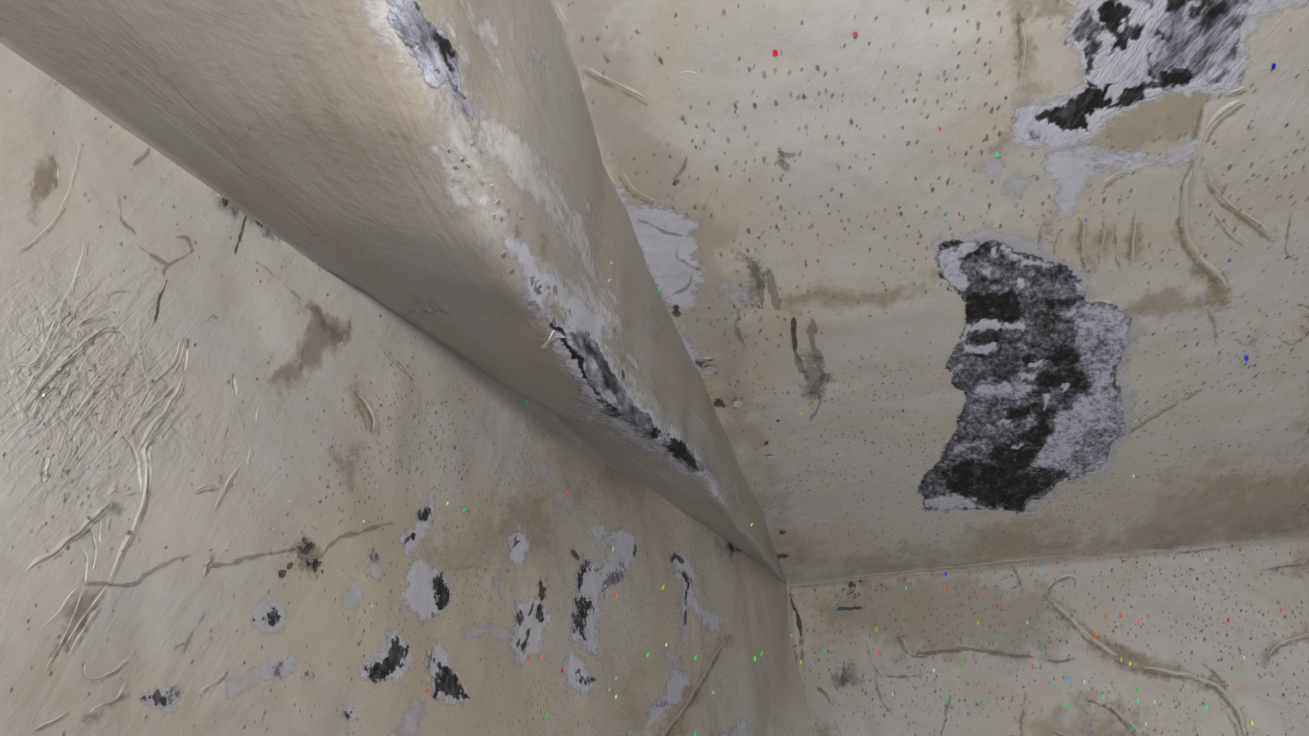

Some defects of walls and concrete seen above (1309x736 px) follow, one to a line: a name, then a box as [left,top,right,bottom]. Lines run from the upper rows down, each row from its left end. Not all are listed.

spalling [978,0,1309,218]
spalling [361,0,736,506]
spalling [917,227,1141,518]
spalling [358,630,470,705]
spalling [399,491,454,622]
spalling [508,580,554,667]
spalling [563,523,639,696]
spalling [628,548,722,736]